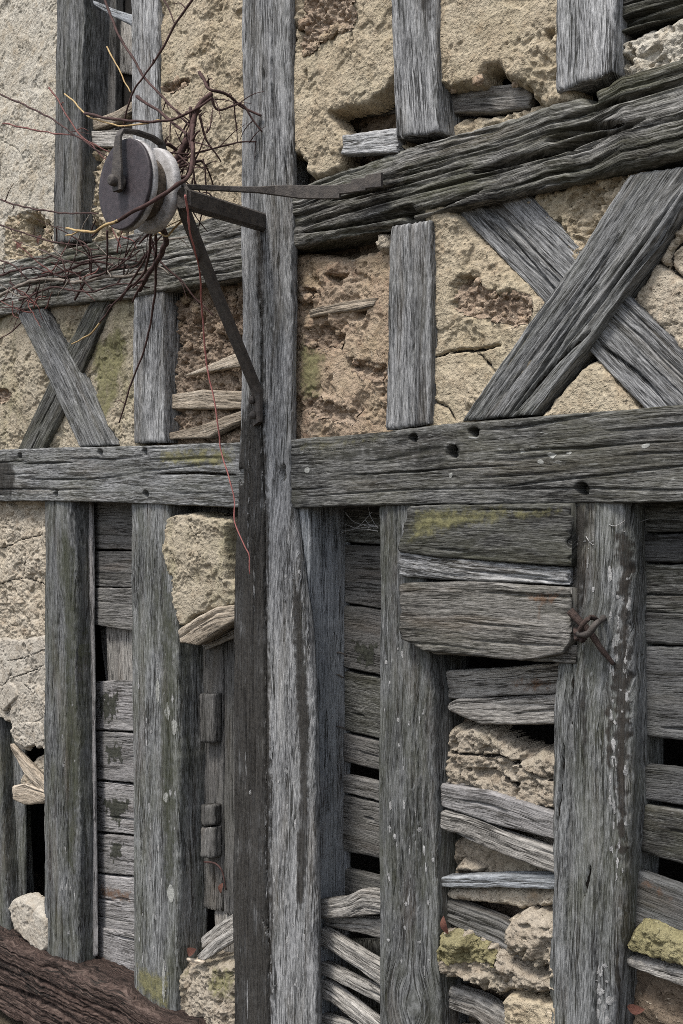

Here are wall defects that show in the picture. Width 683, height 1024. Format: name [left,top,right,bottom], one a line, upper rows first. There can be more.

spalling [297,0,357,57]
spalling [454,277,533,329]
crack [436,346,500,366]